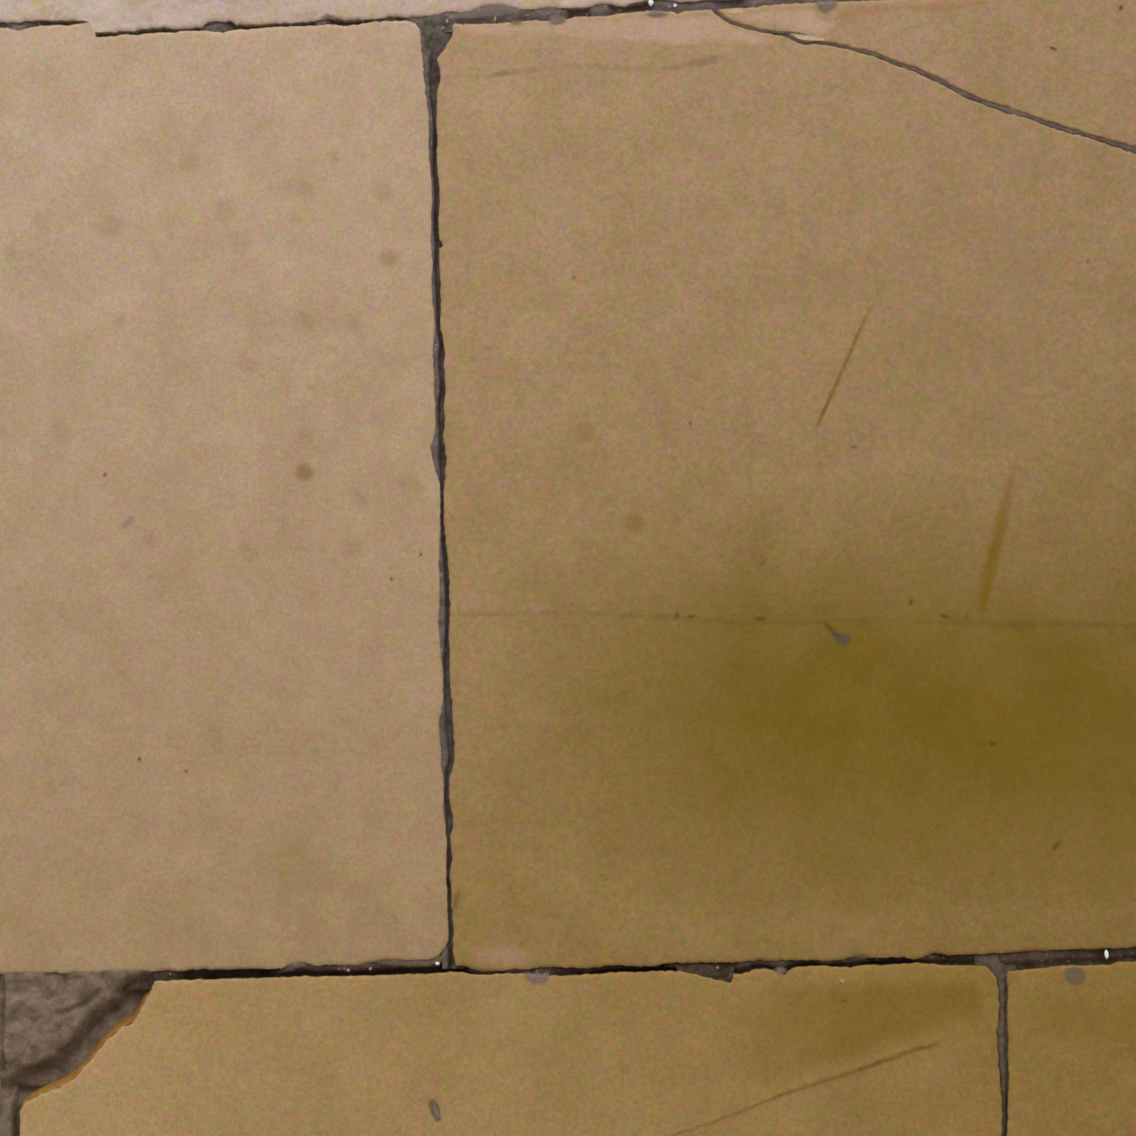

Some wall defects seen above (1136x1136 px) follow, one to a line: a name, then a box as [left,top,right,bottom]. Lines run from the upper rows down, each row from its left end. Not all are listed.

crack [712,8,1136,154]
damp [708,623,1136,792]
spalling [0,970,155,1136]